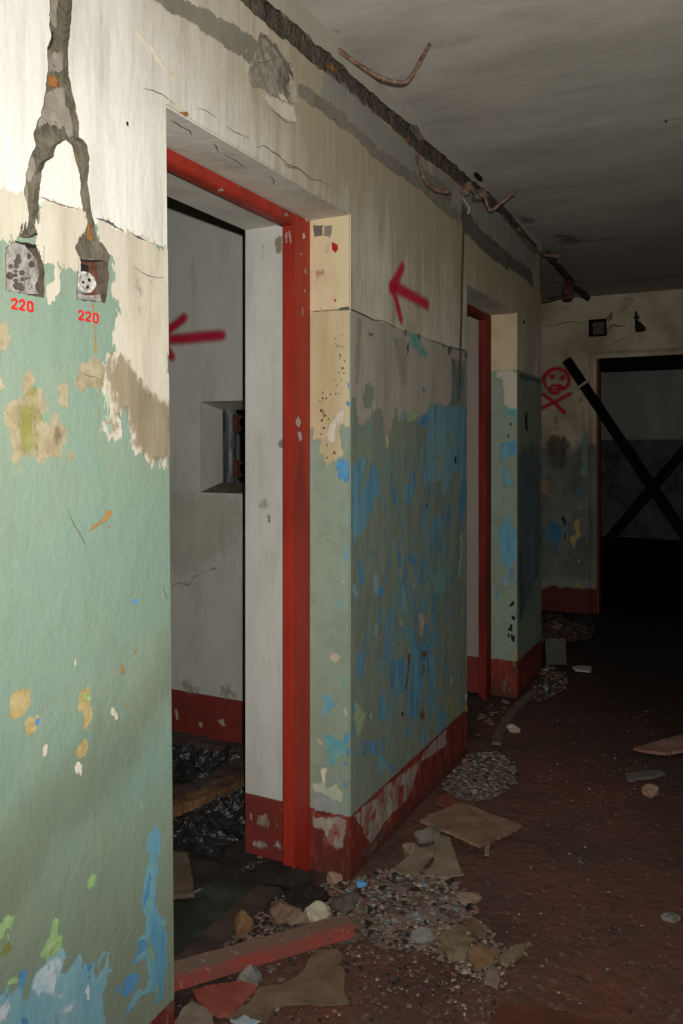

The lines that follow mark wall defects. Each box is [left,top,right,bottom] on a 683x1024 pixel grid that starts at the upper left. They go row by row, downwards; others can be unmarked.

spalling [248,32,298,124]
crack [144,88,330,186]
peeling [0,187,170,476]
peeling [495,370,588,661]
peeling [296,306,468,855]
spalling [9,688,40,736]
spalling [74,686,93,776]
spalling [250,813,270,829]
peeling [0,825,168,1024]